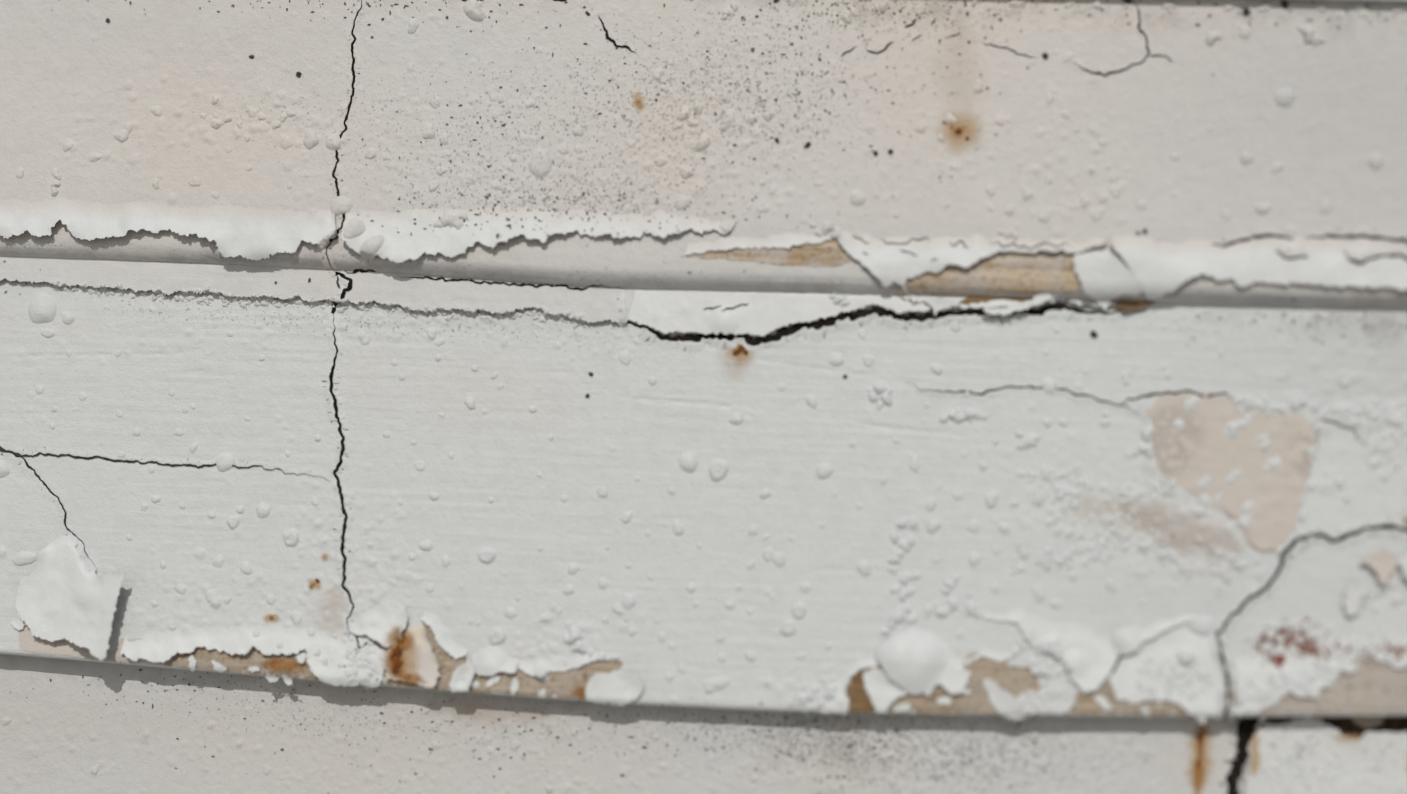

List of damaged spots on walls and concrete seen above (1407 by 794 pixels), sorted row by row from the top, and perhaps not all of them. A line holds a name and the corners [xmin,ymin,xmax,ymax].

crack [1073,0,1173,76]
rust [949,122,971,142]
peeling [0,197,1407,316]
crack [0,0,1149,654]
rust [732,344,748,360]
spalling [1119,390,1407,556]
peeling [10,535,644,706]
rust [389,631,421,684]
crack [1207,515,1407,716]
rust [1192,725,1209,793]